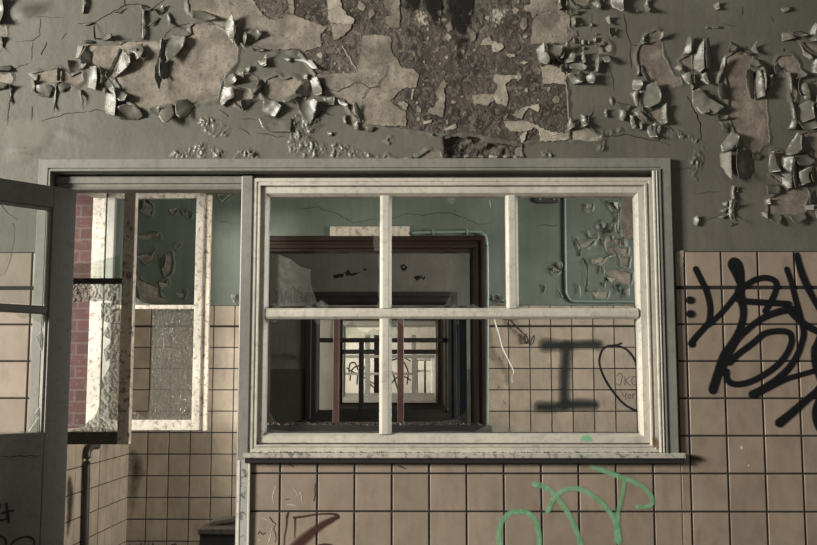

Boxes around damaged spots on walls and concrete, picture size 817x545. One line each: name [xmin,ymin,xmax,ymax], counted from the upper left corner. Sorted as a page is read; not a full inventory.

crack [95,0,190,42]
crack [7,16,66,123]
crack [31,95,102,121]
spalling [28,0,624,158]
peeling [617,22,817,227]
peeling [138,199,156,218]
peeling [136,229,190,305]
peeling [167,205,195,221]
peeling [571,198,634,300]